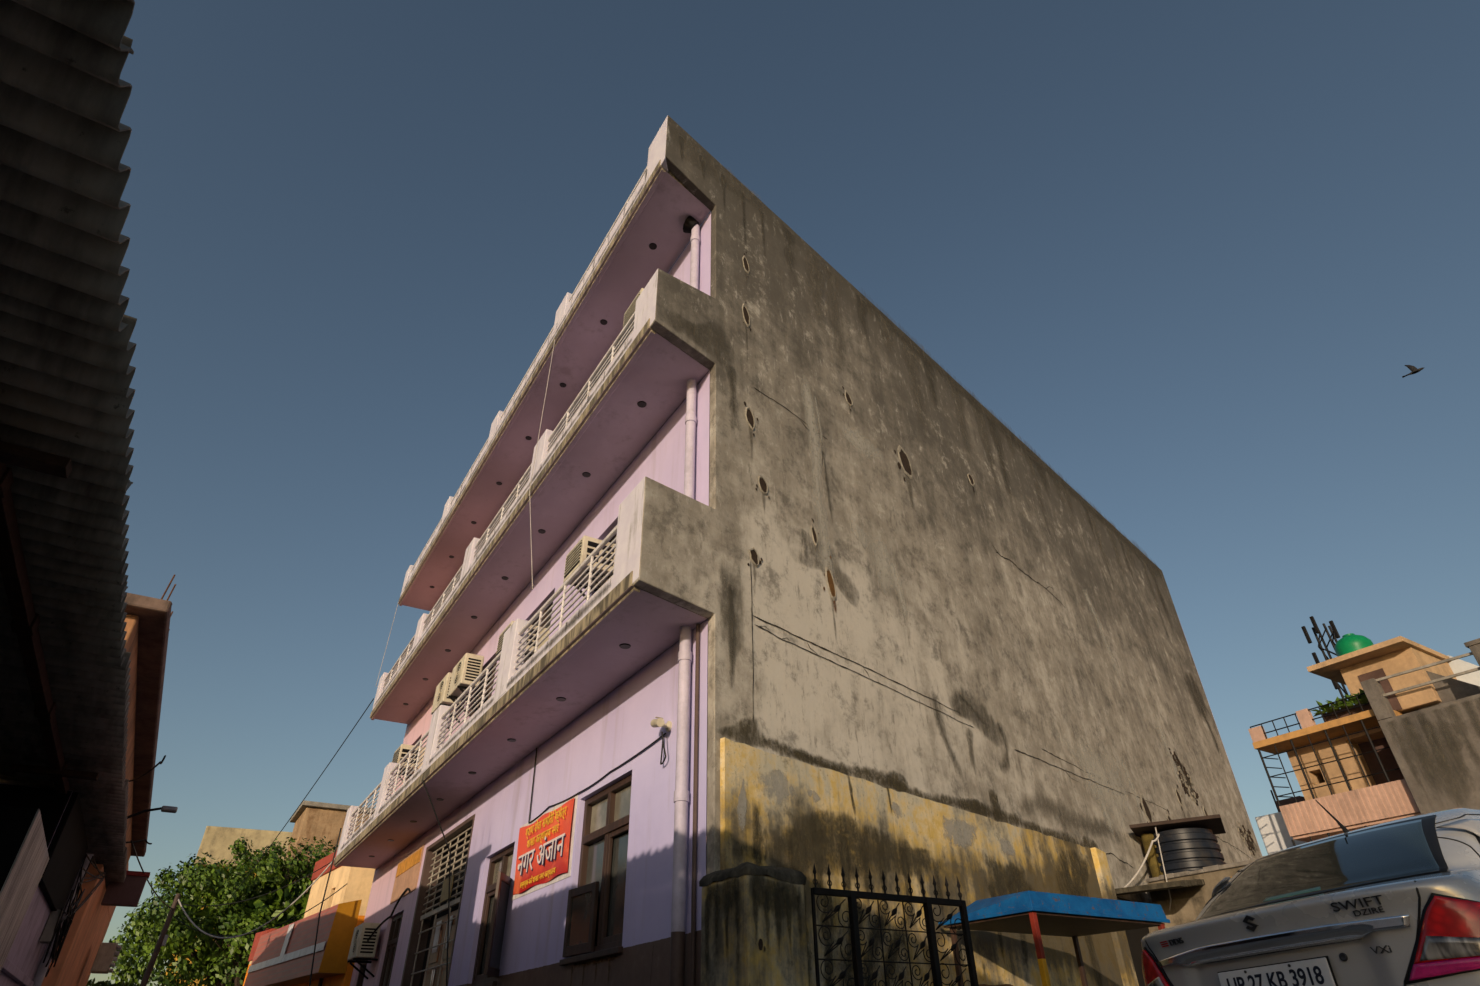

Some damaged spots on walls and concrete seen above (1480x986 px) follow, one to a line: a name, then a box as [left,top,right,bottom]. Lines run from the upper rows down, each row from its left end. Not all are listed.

leakage [935,692,1009,769]
leakage [1187,676,1218,748]
leakage [705,719,1139,986]